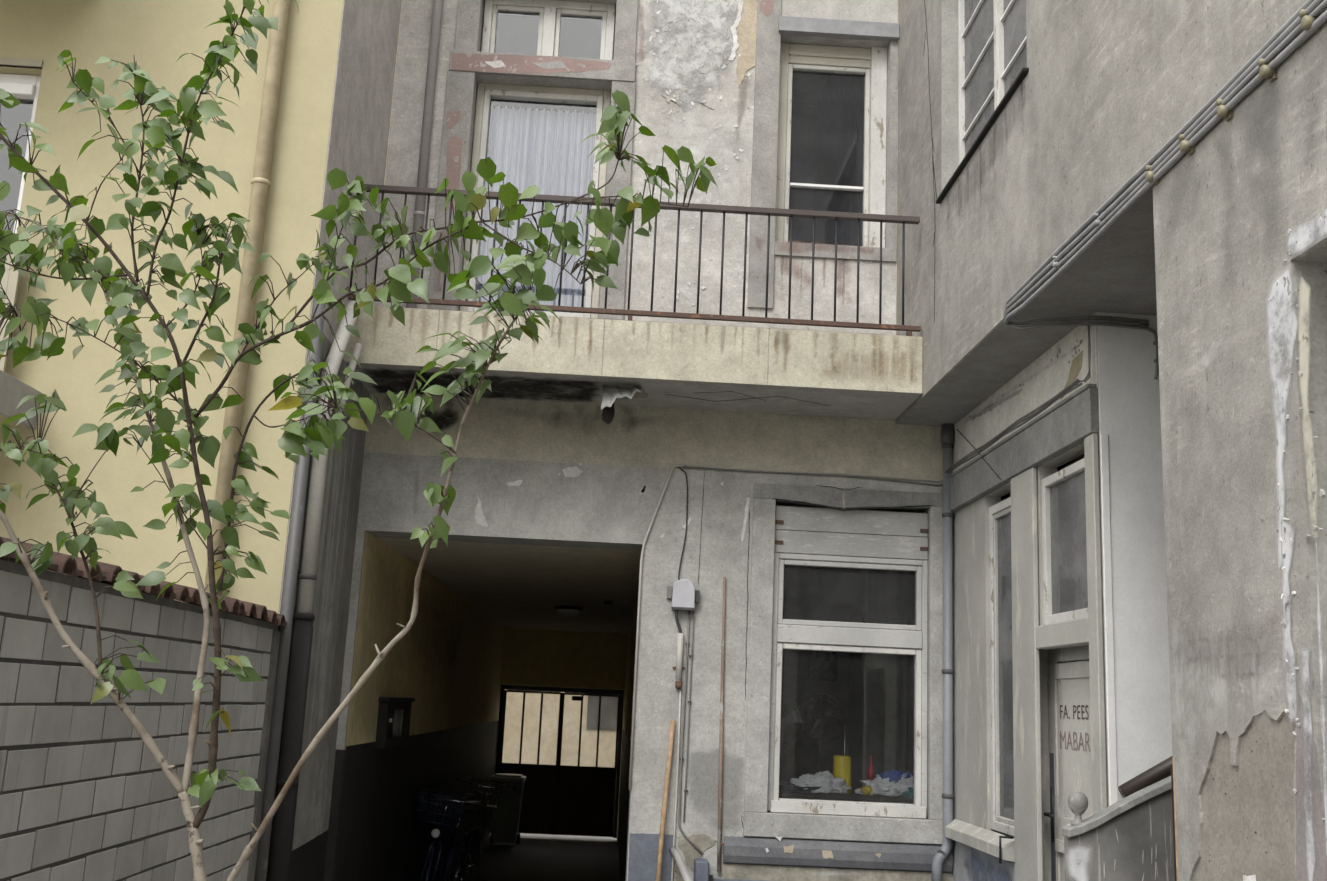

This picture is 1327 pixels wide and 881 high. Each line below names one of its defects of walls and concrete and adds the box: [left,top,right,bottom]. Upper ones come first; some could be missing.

flaking render [636,0,774,176]
leakage [421,410,457,430]
leakage [367,370,597,401]
peeling [1267,208,1327,881]